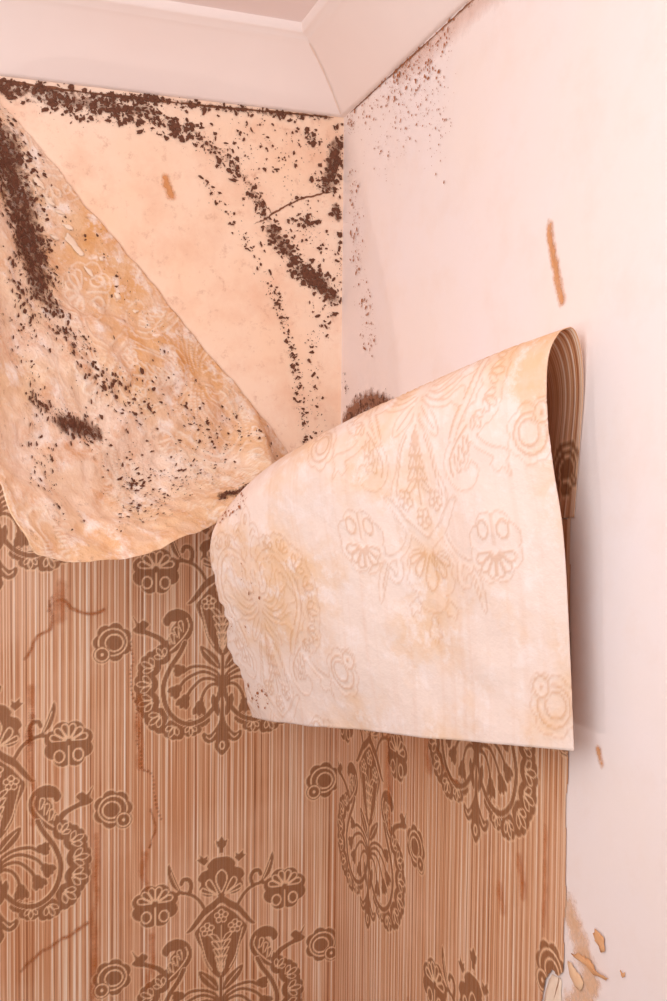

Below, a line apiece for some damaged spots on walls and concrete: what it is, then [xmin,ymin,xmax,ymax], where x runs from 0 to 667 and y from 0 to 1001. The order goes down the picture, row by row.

crack [10,0,473,118]
peeling [33,176,94,277]
damp [0,18,455,532]